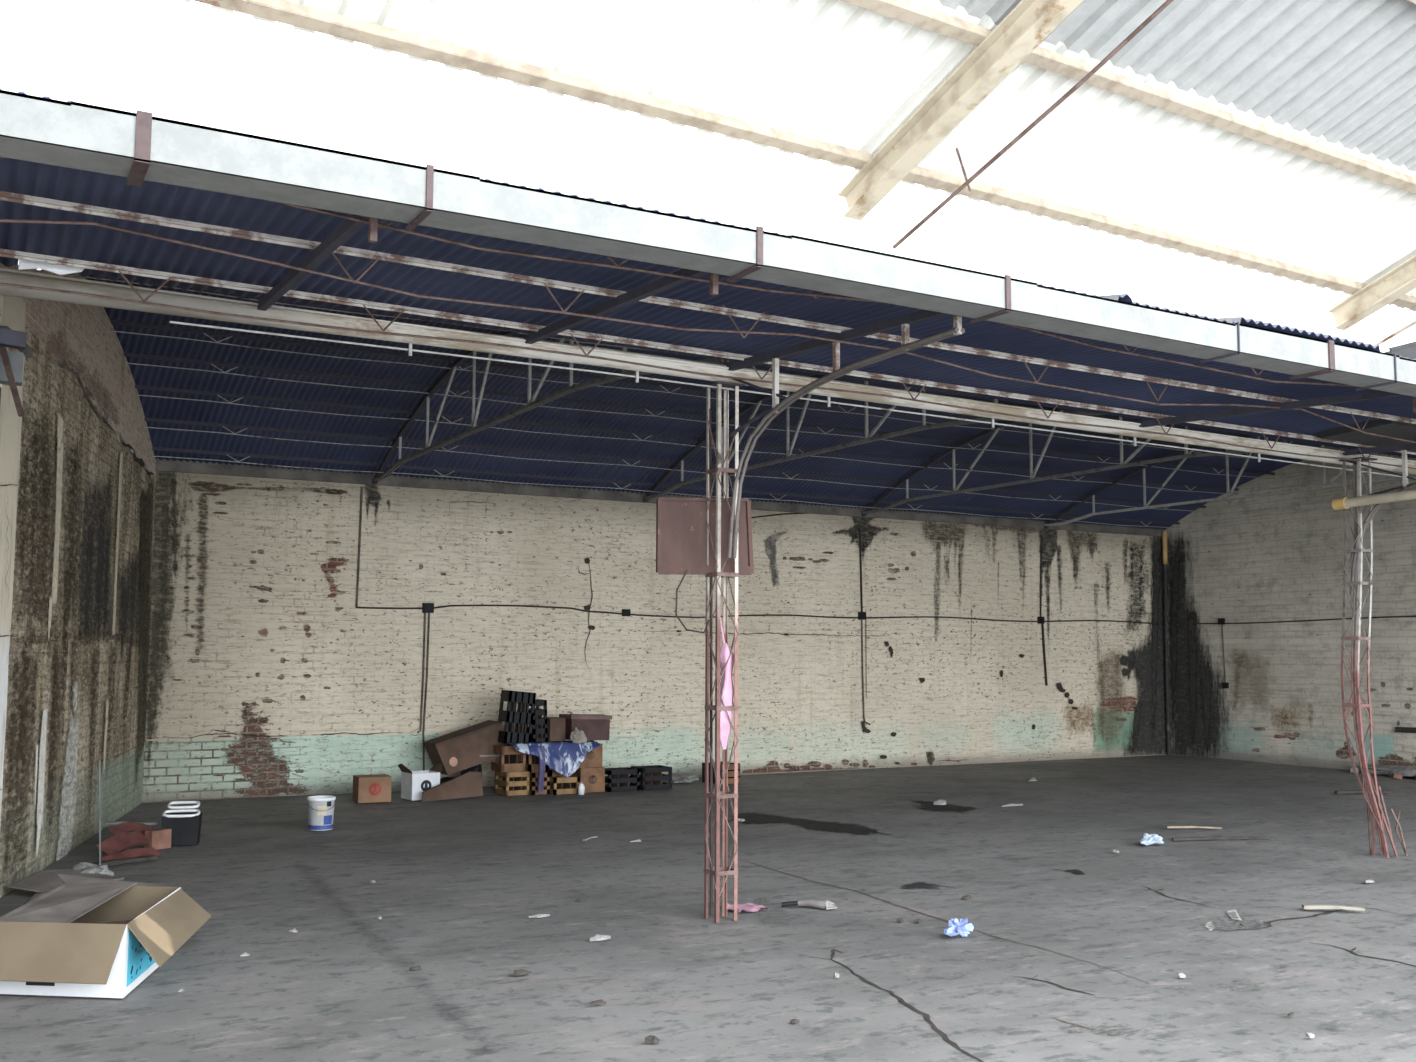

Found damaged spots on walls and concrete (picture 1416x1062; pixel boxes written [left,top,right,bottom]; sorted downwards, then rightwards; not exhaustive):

peeling [311,541,349,610]
water stain [765,532,785,585]
water stain [833,517,887,556]
water stain [1,410,208,875]
water stain [923,521,1229,757]
spalling [212,699,311,797]
crack [701,848,1148,1035]
crack [815,949,984,1062]